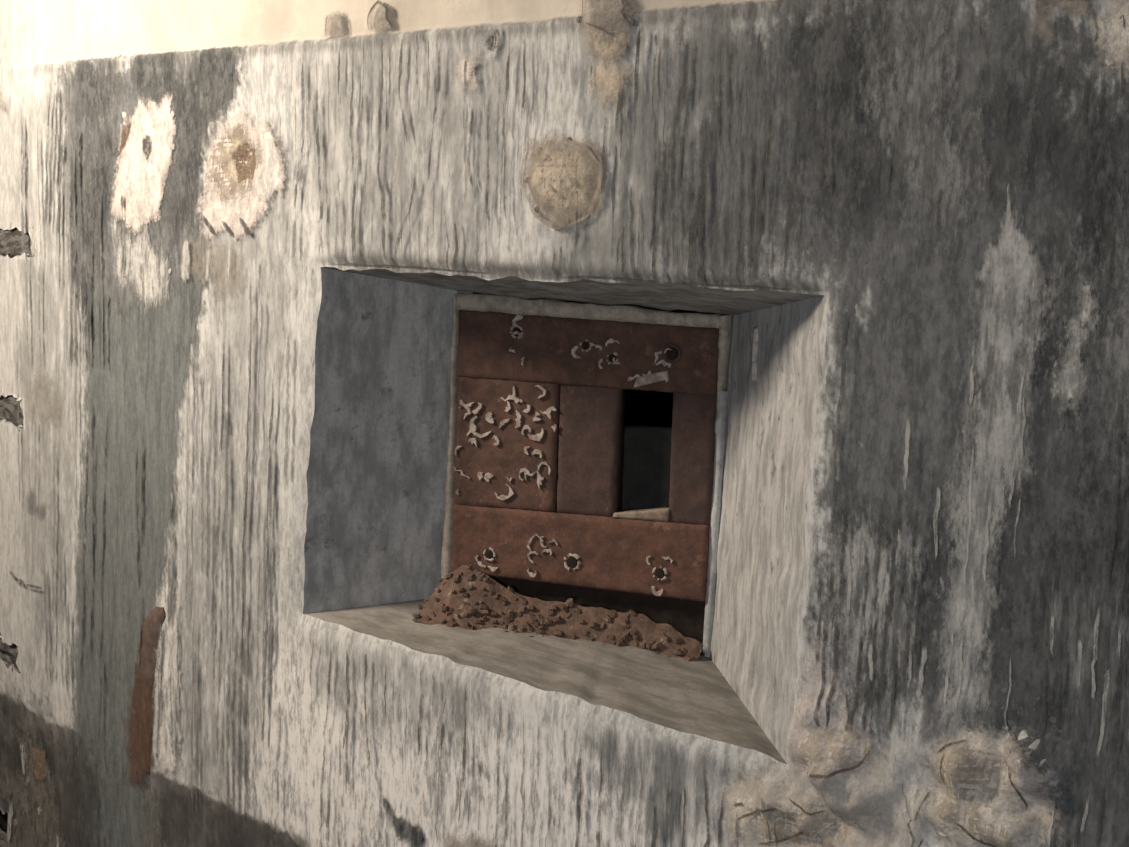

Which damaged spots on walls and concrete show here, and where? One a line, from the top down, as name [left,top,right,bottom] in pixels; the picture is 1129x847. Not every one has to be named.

peeling [1090,0,1129,69]
peeling [111,95,190,304]
spalling [197,111,286,276]
leakage [294,35,458,271]
leakage [462,41,539,264]
spalling [520,137,603,229]
leakage [16,47,290,847]
leakage [495,0,1129,847]
rust [126,678,154,788]
leakage [320,653,350,847]
peeling [383,798,424,847]
leakage [454,690,481,830]